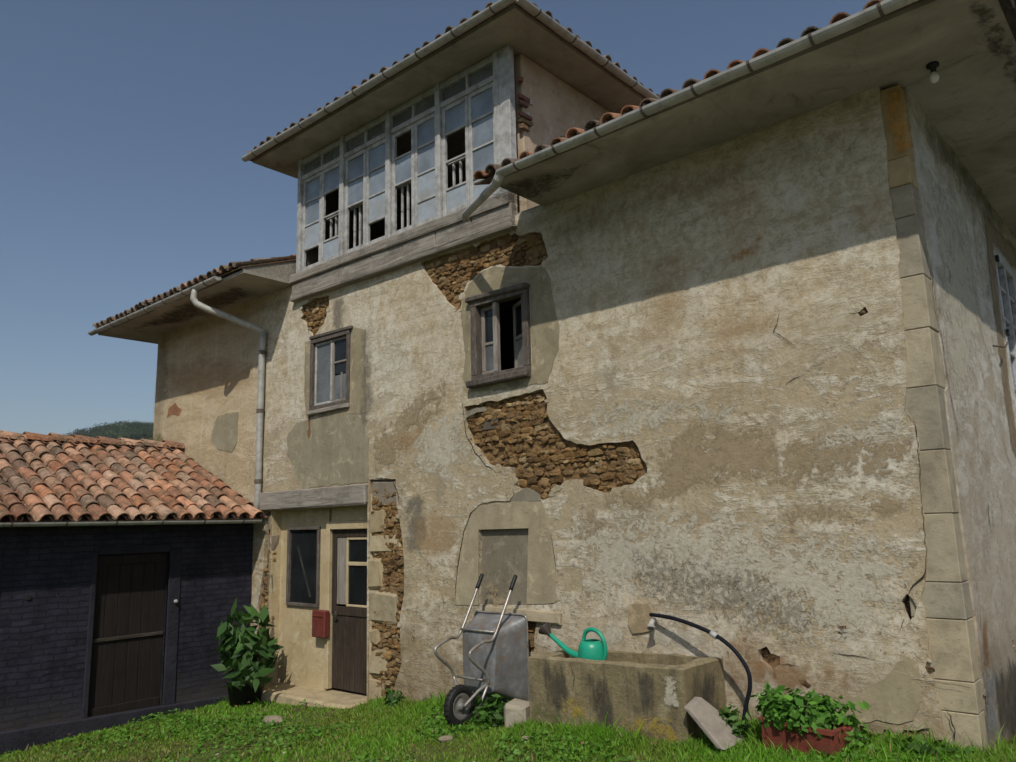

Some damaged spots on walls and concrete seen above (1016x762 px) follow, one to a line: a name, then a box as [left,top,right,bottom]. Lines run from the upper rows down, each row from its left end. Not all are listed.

spalling [517,76,533,132]
spalling [424,229,549,312]
spalling [300,296,331,335]
spalling [467,390,911,509]
spalling [370,382,446,701]
peeling [574,514,610,540]
crack [905,409,927,594]
damp [985,659,1016,737]